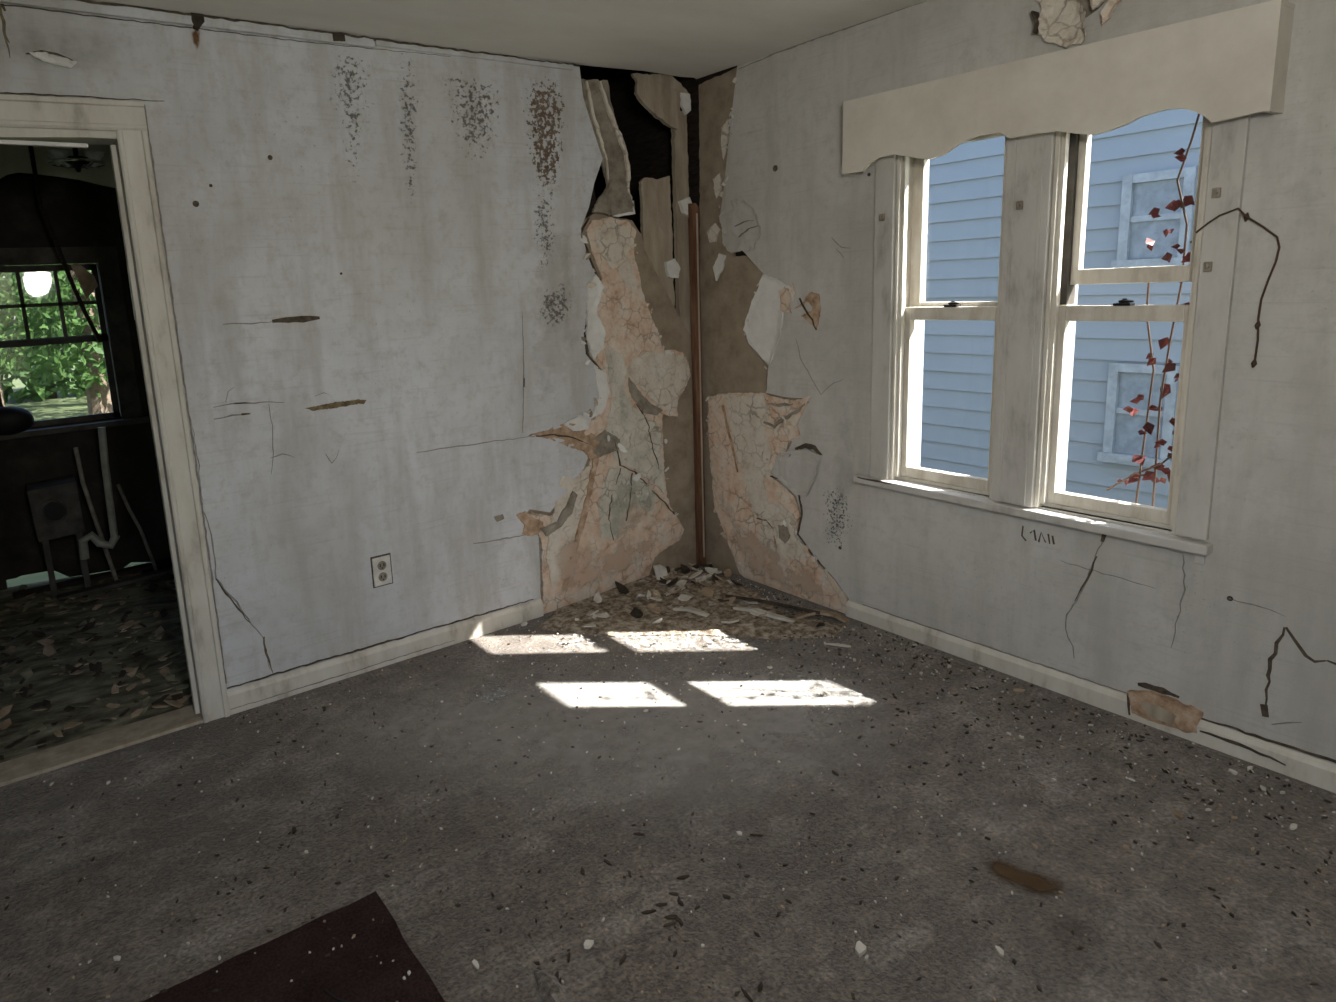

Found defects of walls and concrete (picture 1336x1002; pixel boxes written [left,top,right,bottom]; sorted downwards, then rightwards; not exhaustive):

spalling [1031,0,1121,48]
water stain [333,56,367,167]
water stain [399,62,418,195]
water stain [449,73,499,158]
mould [523,79,565,264]
water stain [540,284,570,324]
spalling [494,67,849,614]
crack [192,387,366,673]
crack [1060,534,1186,658]
crack [1229,598,1336,725]
peeling [1127,683,1286,766]